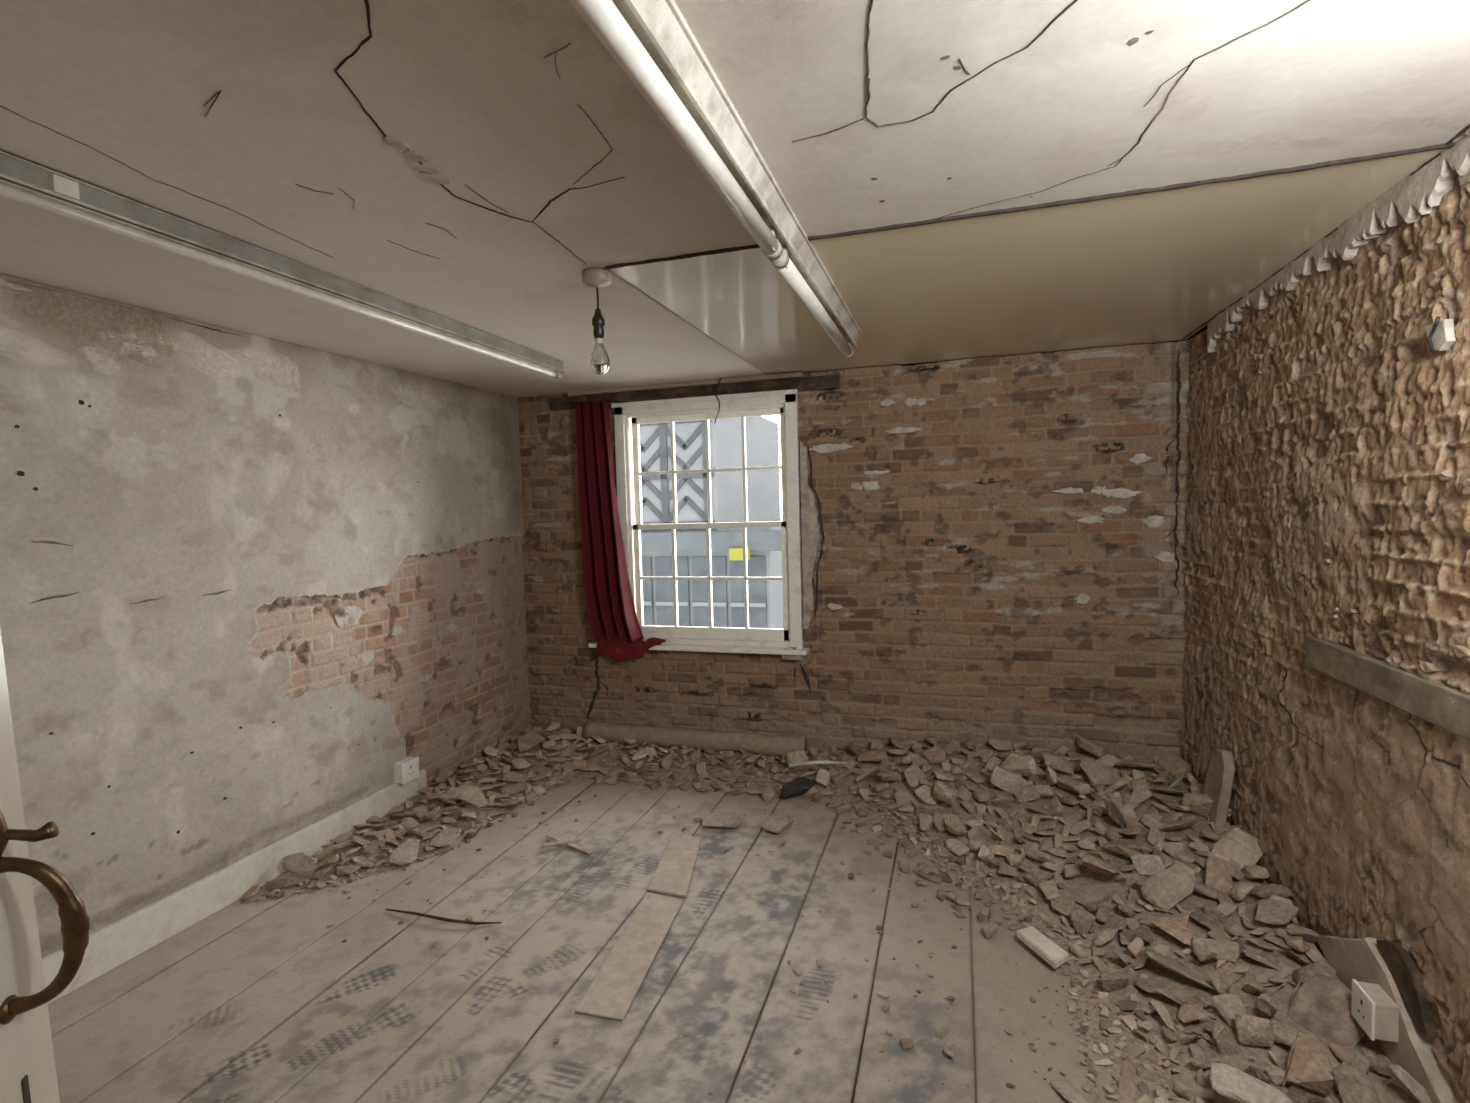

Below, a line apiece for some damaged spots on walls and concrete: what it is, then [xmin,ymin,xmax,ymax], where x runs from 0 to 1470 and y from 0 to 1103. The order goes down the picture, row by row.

crack [0,106,333,258]
crack [204,90,222,117]
crack [295,184,355,209]
crack [334,0,760,269]
crack [791,0,1470,241]
crack [5,280,240,336]
crack [1164,227,1339,596]
spalling [1439,467,1470,503]
flaking render [247,534,532,787]
spalling [1420,643,1470,673]